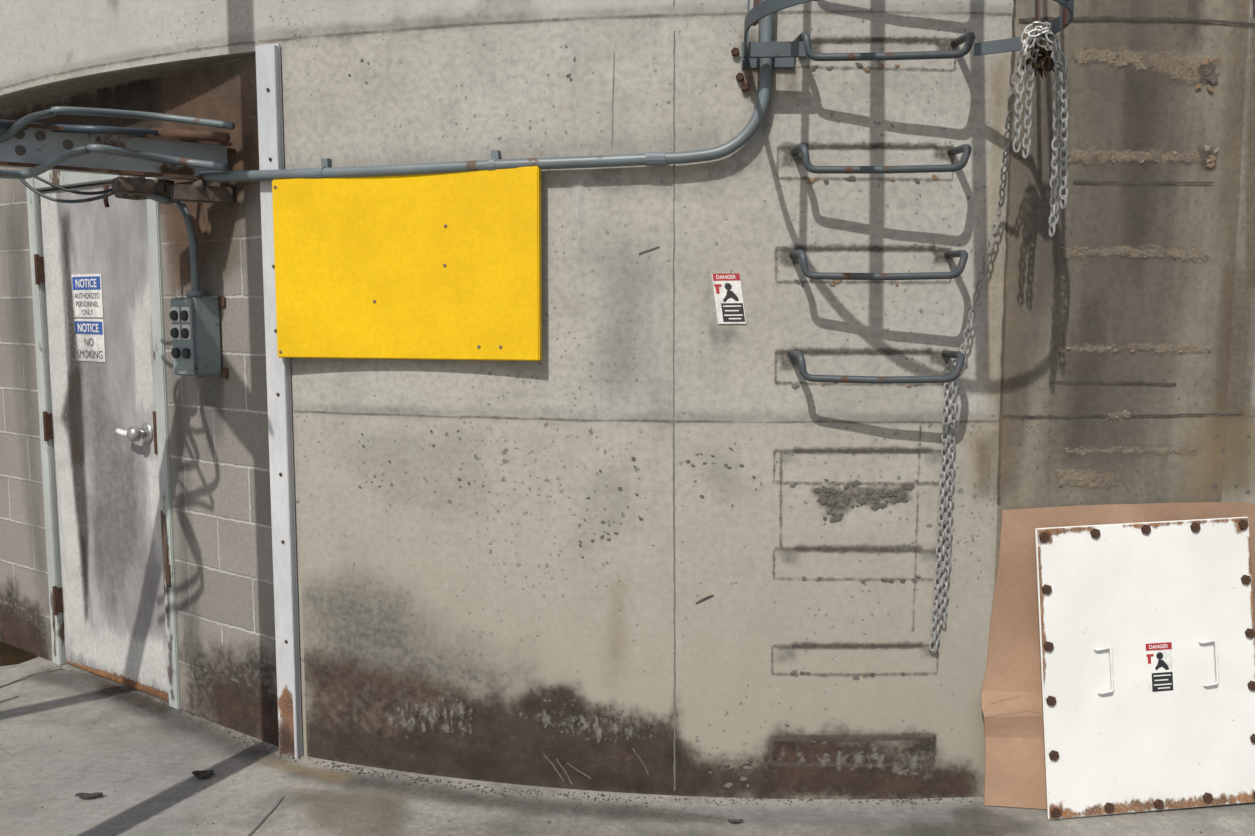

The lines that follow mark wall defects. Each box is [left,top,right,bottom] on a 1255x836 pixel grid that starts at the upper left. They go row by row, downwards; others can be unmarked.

water stain [69,374,135,617]
spalling [813,482,914,522]
water stain [0,584,279,756]
rust [277,686,295,755]
water stain [306,596,1013,836]